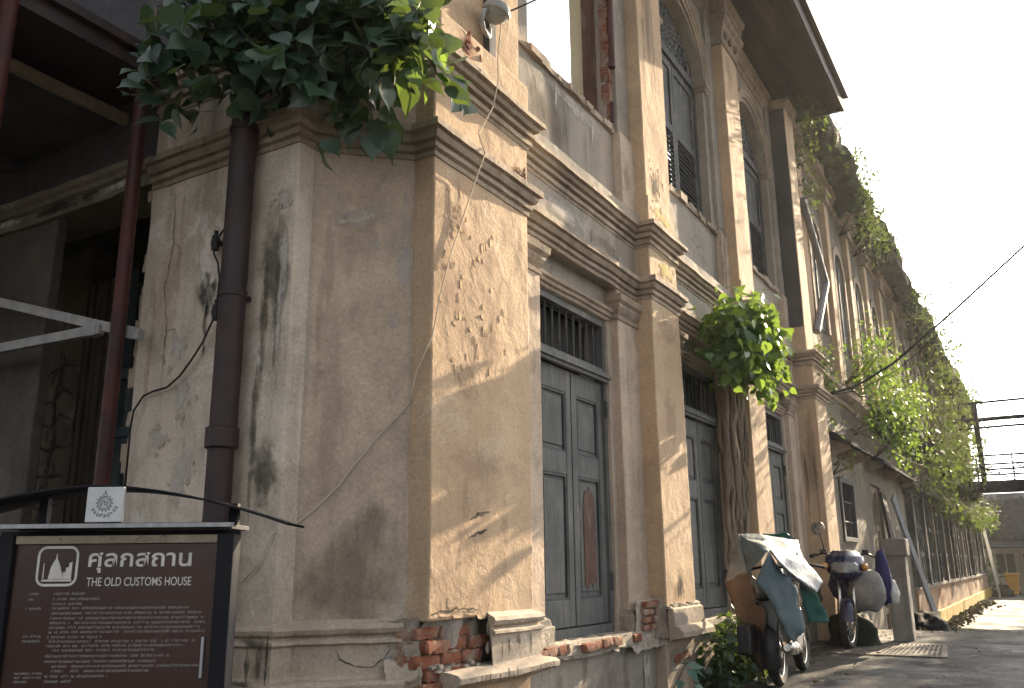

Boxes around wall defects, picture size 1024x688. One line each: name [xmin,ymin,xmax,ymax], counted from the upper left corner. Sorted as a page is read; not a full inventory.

water stain [199,273,216,352]
peeling [434,186,504,395]
water stain [249,230,288,494]
crack [336,649,391,668]
spalling [377,611,490,688]
spalling [541,598,698,670]